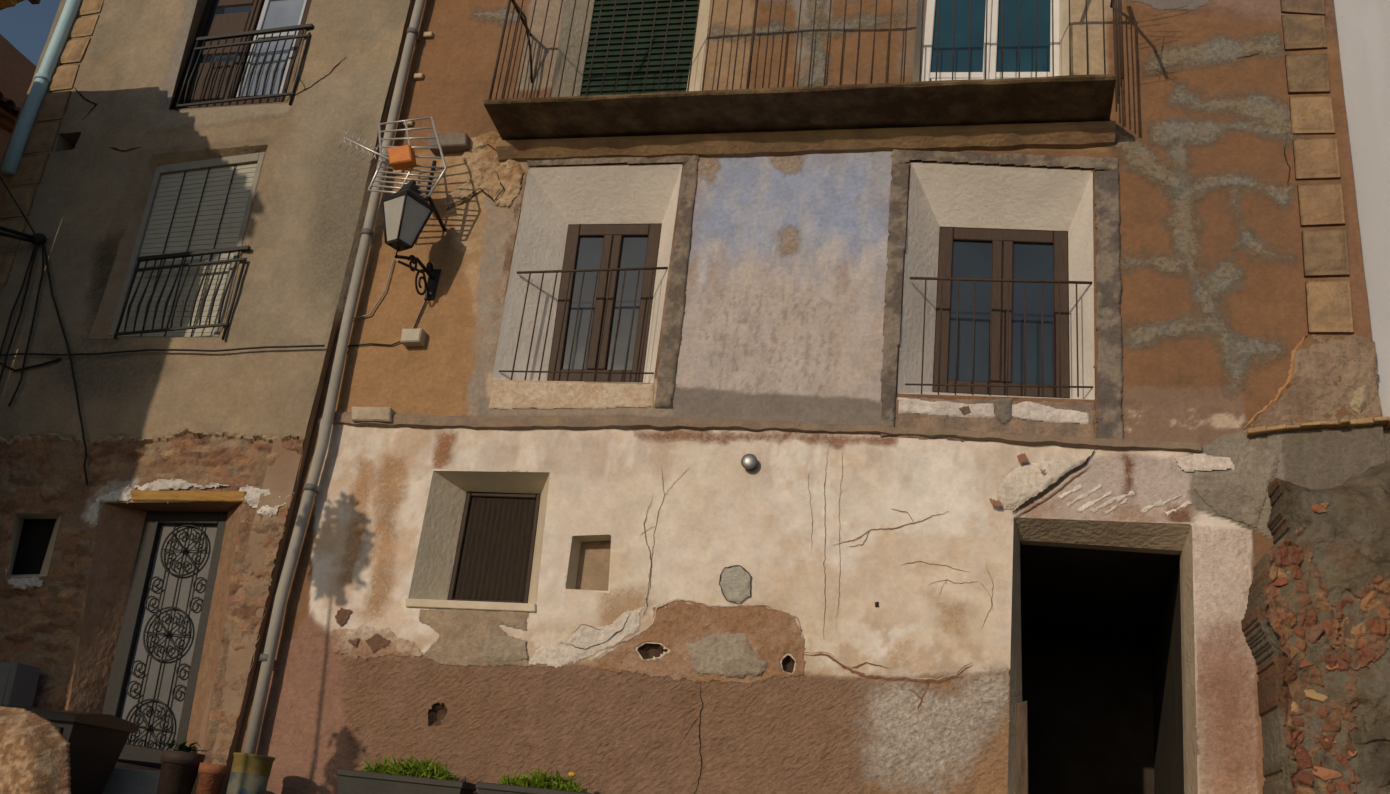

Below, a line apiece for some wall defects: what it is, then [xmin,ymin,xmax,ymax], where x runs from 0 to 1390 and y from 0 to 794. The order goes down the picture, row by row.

spalling [440,131,525,305]
peeling [5,569,44,590]
spalling [0,427,298,447]
peeling [86,478,294,525]
peeling [527,494,806,683]
crack [803,453,972,712]
crack [900,561,994,622]
spalling [1262,502,1390,794]